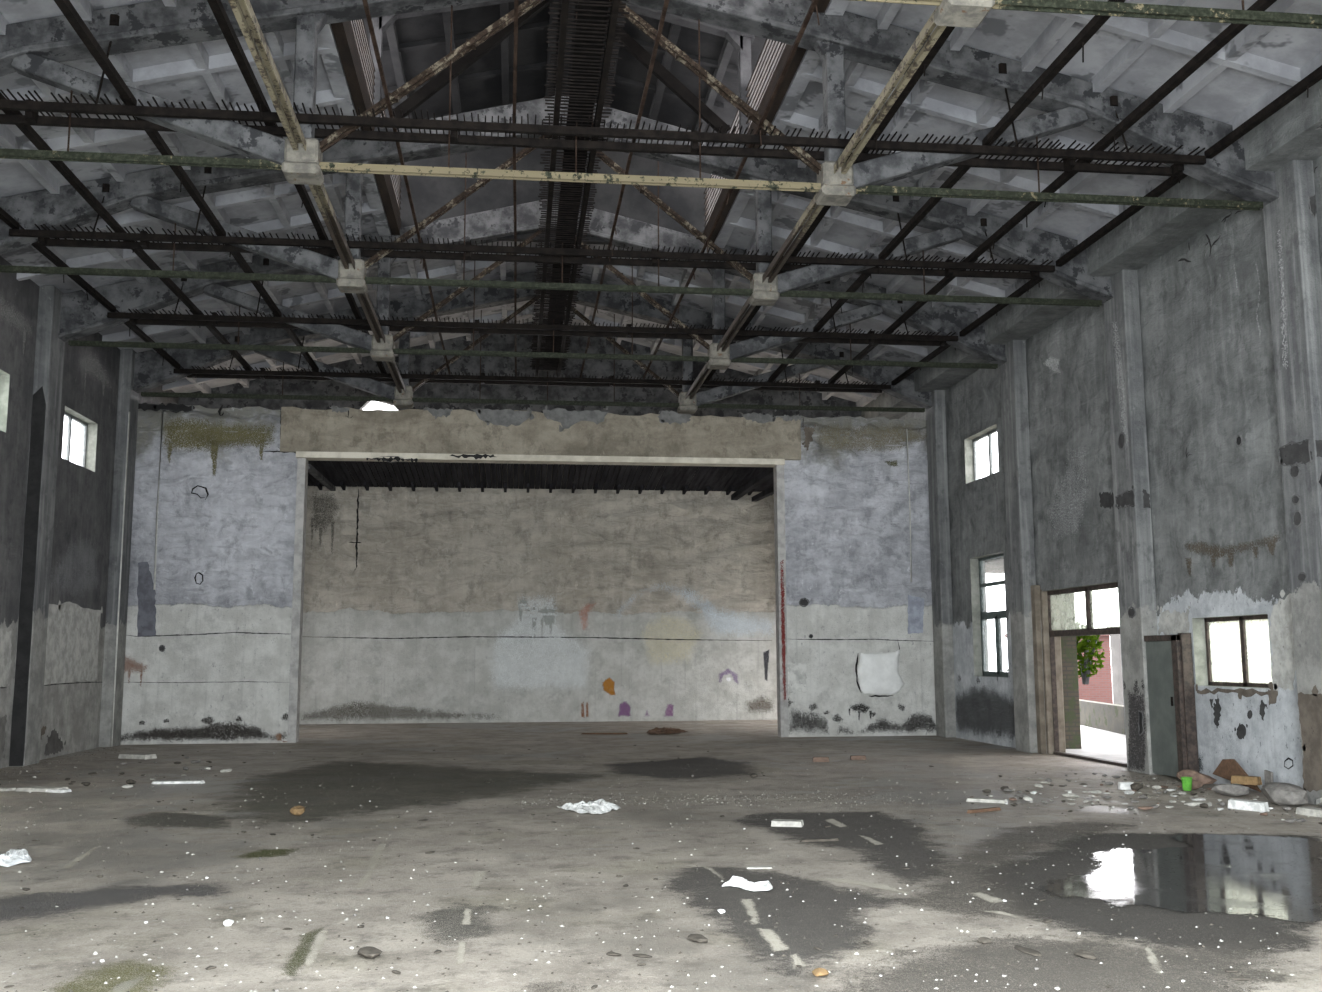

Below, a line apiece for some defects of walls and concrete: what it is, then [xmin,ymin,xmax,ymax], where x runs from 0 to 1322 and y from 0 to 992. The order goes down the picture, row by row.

damp [210,443,219,476]
peeling [0,628,12,687]
peeling [1194,572,1322,792]